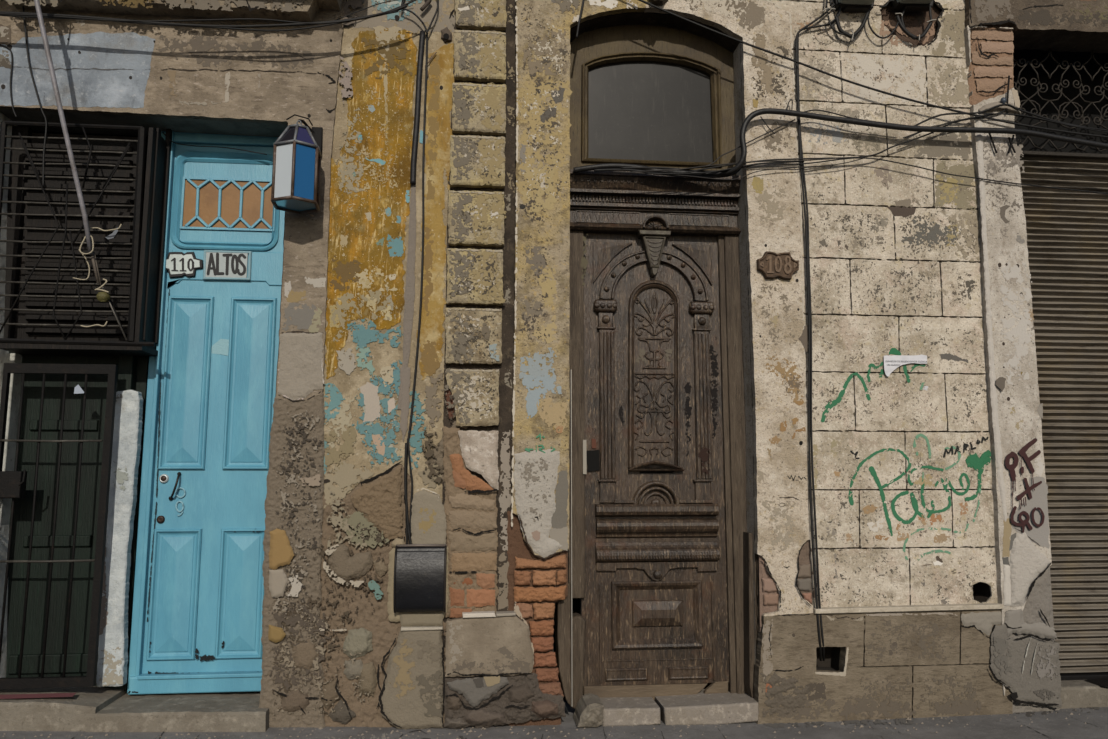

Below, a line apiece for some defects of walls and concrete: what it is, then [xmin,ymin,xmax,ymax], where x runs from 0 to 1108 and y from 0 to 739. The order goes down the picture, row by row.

peeling [839,2,942,107]
spalling [968,26,1020,108]
spalling [252,86,568,729]
spalling [759,555,779,631]
spalling [797,540,819,604]
peeling [1002,533,1016,606]
spalling [1008,566,1059,680]
spalling [1011,692,1060,713]